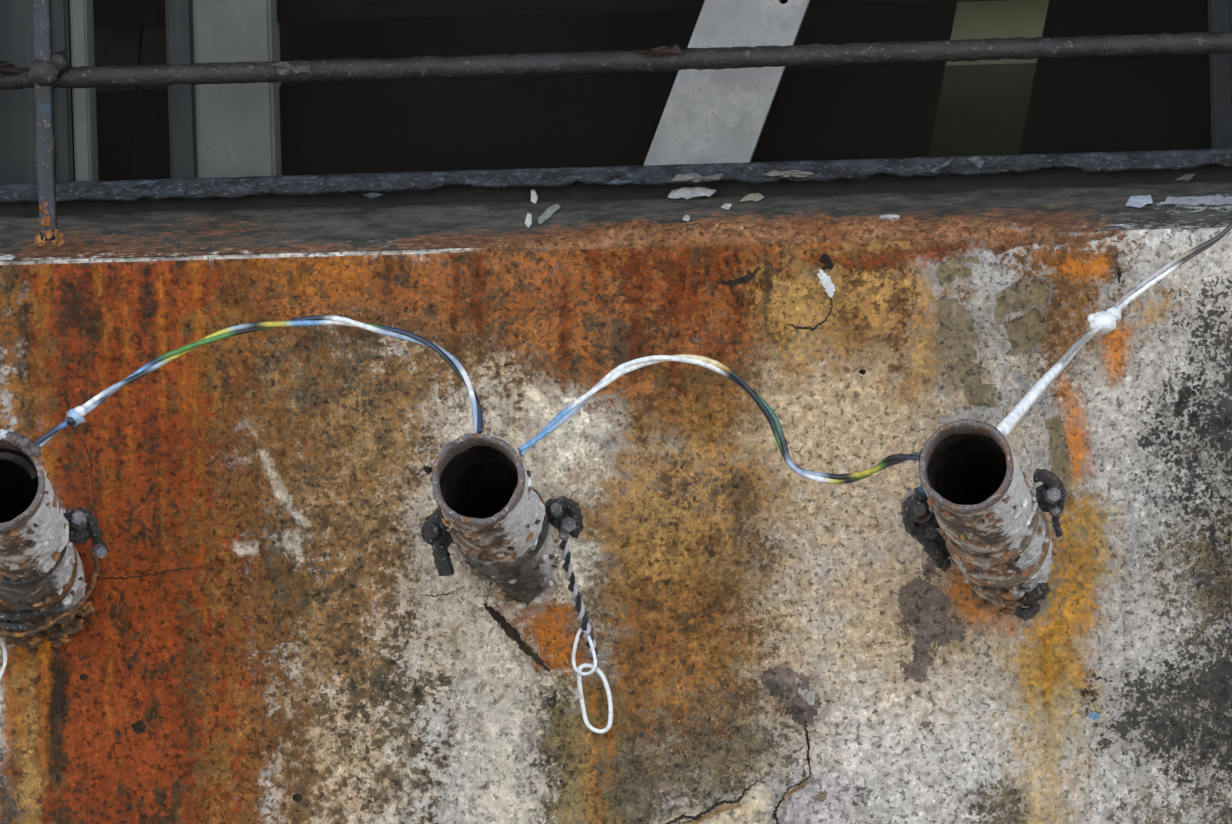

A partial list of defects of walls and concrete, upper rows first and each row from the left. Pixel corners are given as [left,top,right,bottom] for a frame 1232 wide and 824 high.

corrosion [0,240,979,824]
crack [666,723,812,824]
corrosion [947,235,1190,715]
damp [1072,275,1232,824]